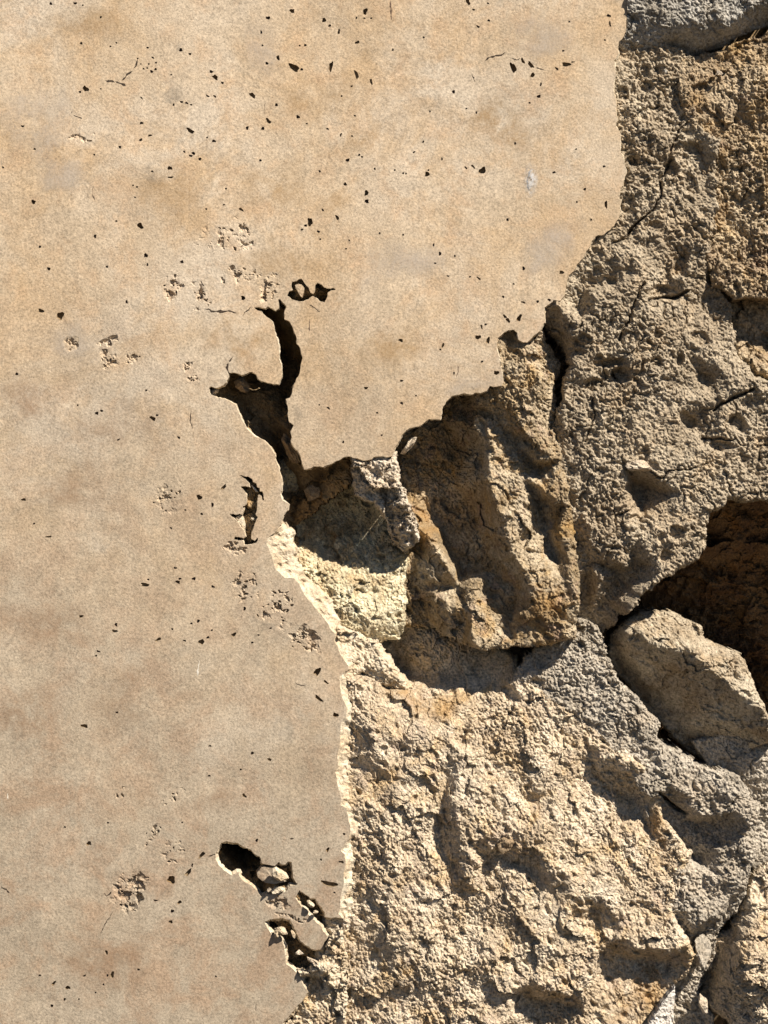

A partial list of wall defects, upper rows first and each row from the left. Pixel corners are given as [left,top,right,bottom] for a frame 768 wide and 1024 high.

spalling [302,19,627,470]
crack [617,122,687,242]
crack [207,299,303,525]
crack [398,329,580,651]
spalling [143,475,359,1024]
spalling [647,983,676,1024]